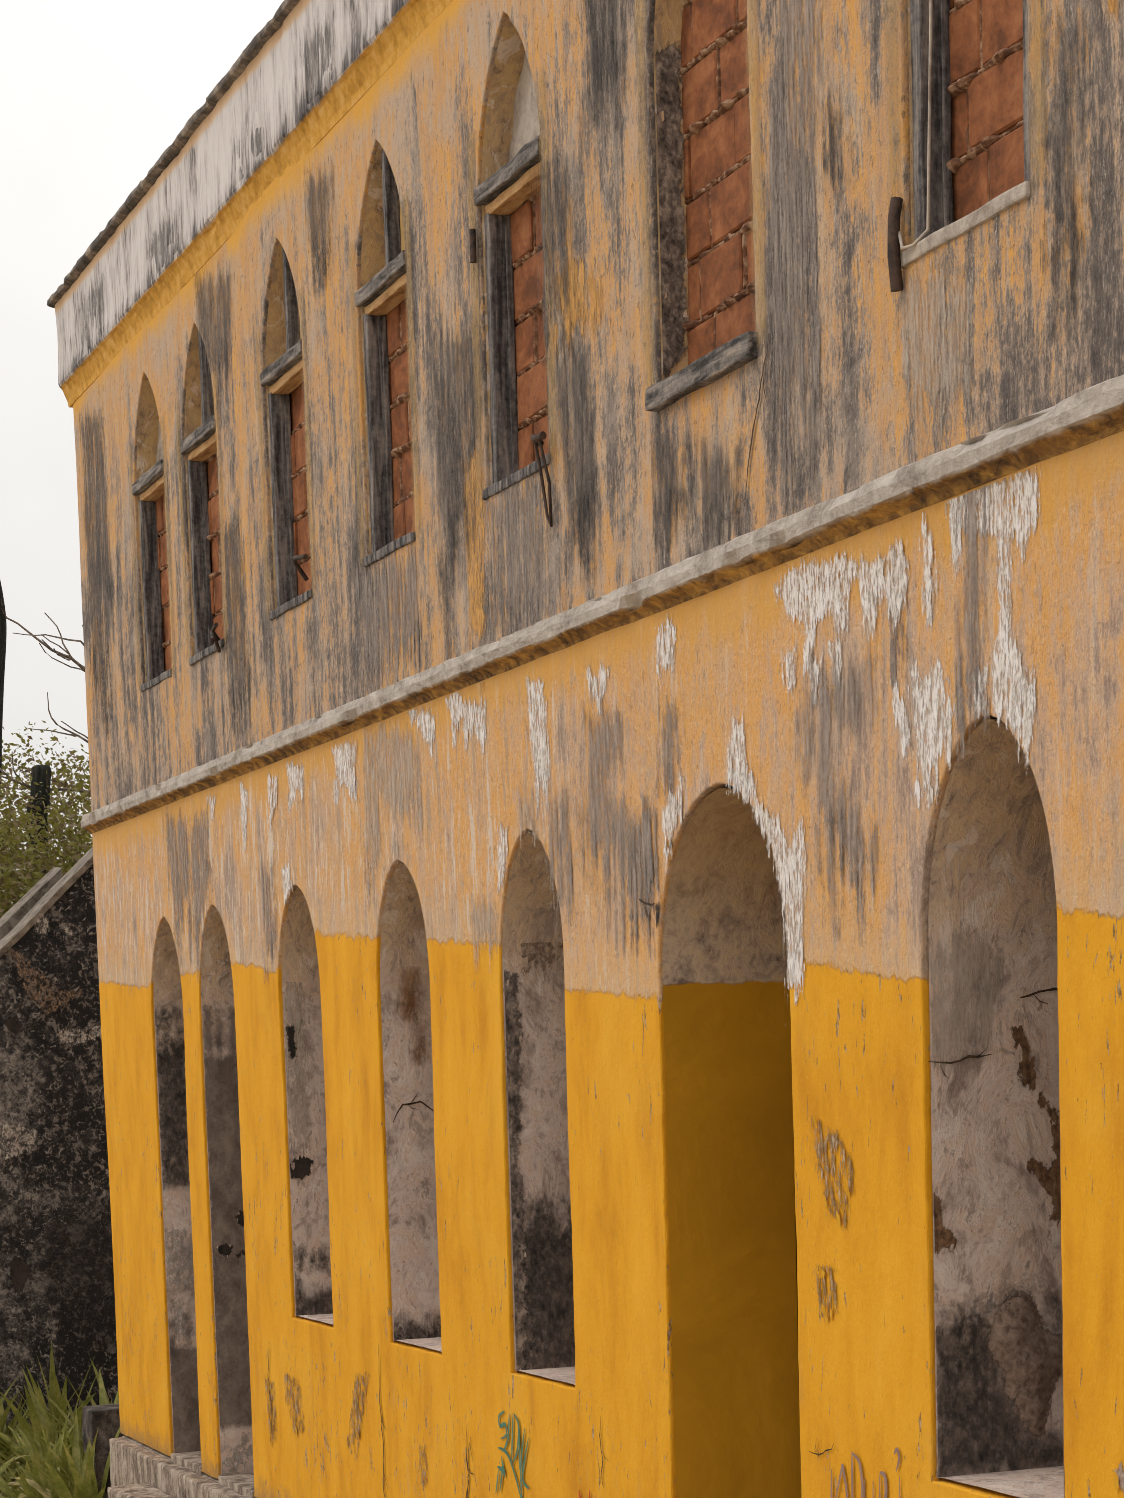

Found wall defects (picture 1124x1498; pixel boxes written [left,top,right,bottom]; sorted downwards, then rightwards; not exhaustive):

water stain [434,0,625,657]
water stain [755,0,853,514]
water stain [79,410,113,741]
water stain [543,689,683,957]
peeling [726,713,807,1003]
water stain [794,582,908,940]
peeling [773,470,1040,809]
water stain [954,486,998,758]
water stain [511,1201,575,1373]
peeling [811,1116,854,1232]
water stain [936,1290,1063,1481]
peeling [1114,1461,1124,1494]